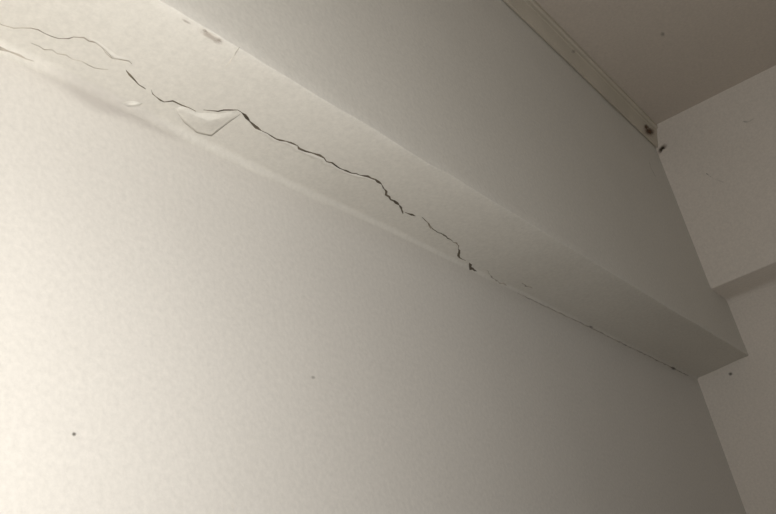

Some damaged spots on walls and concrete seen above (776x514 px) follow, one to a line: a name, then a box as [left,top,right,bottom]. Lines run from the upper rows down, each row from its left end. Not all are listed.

crack [0,24,687,375]